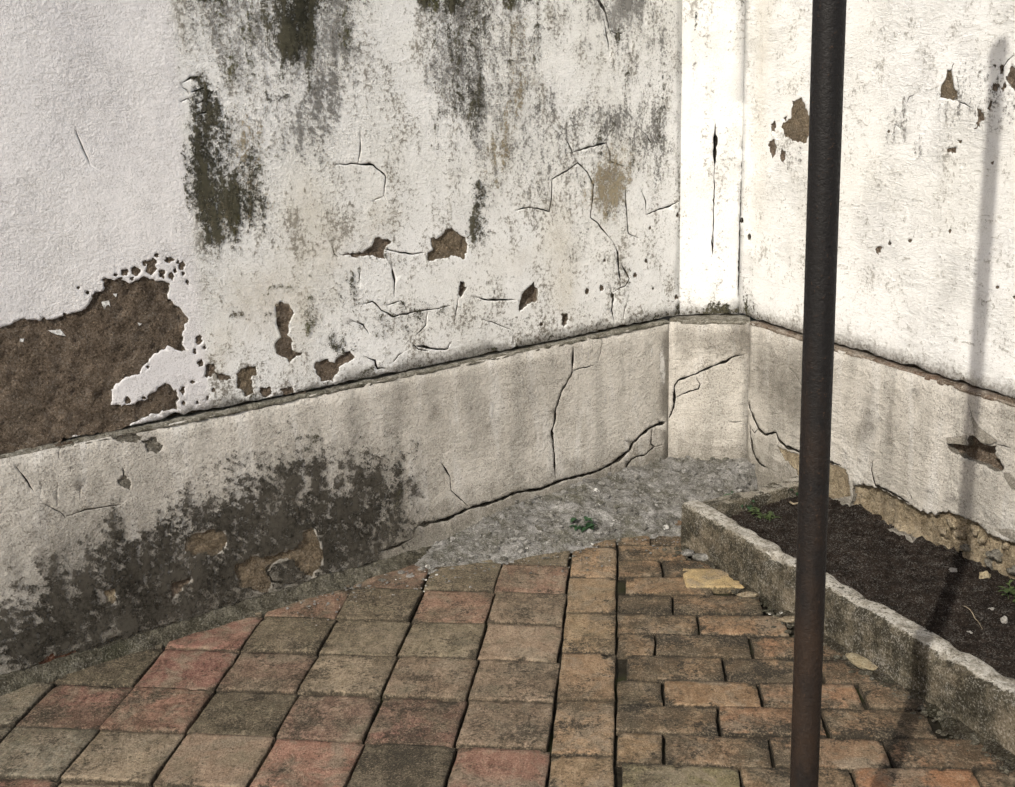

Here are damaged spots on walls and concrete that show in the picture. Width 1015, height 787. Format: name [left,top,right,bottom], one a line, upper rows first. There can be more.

spalling [0,253,306,454]
leakage [178,0,374,248]
crack [341,138,386,200]
leakage [325,247,404,358]
spalling [344,228,467,261]
leakage [374,296,445,340]
crack [353,269,514,369]
leakage [416,0,681,247]
crack [515,135,677,319]
spalling [769,98,809,162]
crack [366,347,740,564]
spalling [829,463,1015,579]